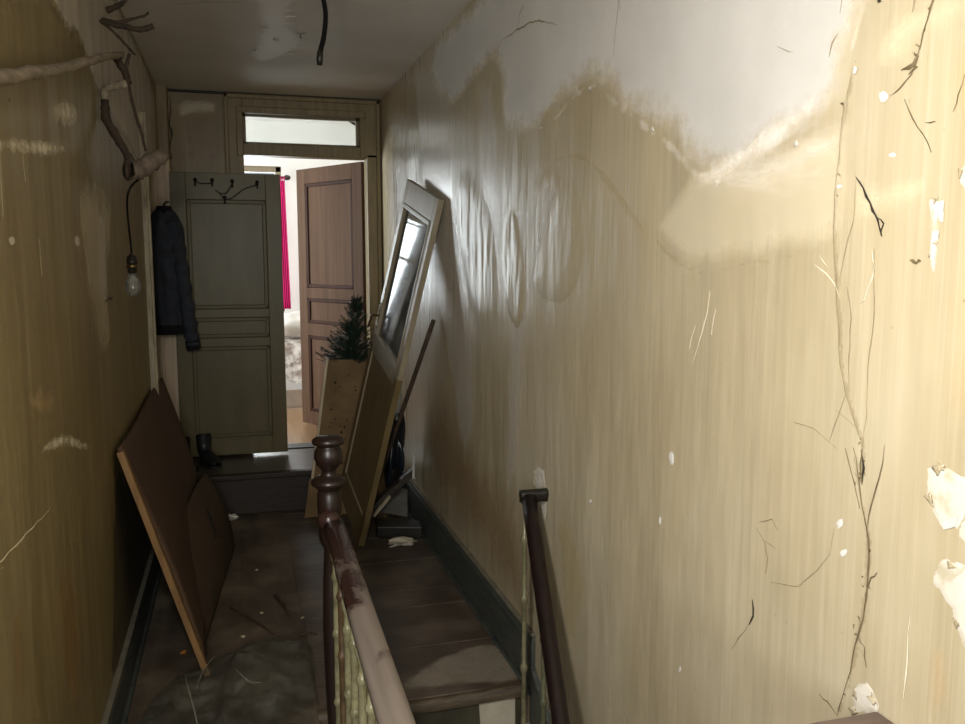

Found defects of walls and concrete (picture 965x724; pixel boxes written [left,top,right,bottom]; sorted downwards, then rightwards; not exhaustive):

peeling [434,0,848,156]
crack [891,0,965,152]
peeling [910,196,944,272]
crack [794,71,884,714]
flaking render [924,462,965,542]
flaking render [933,559,965,647]